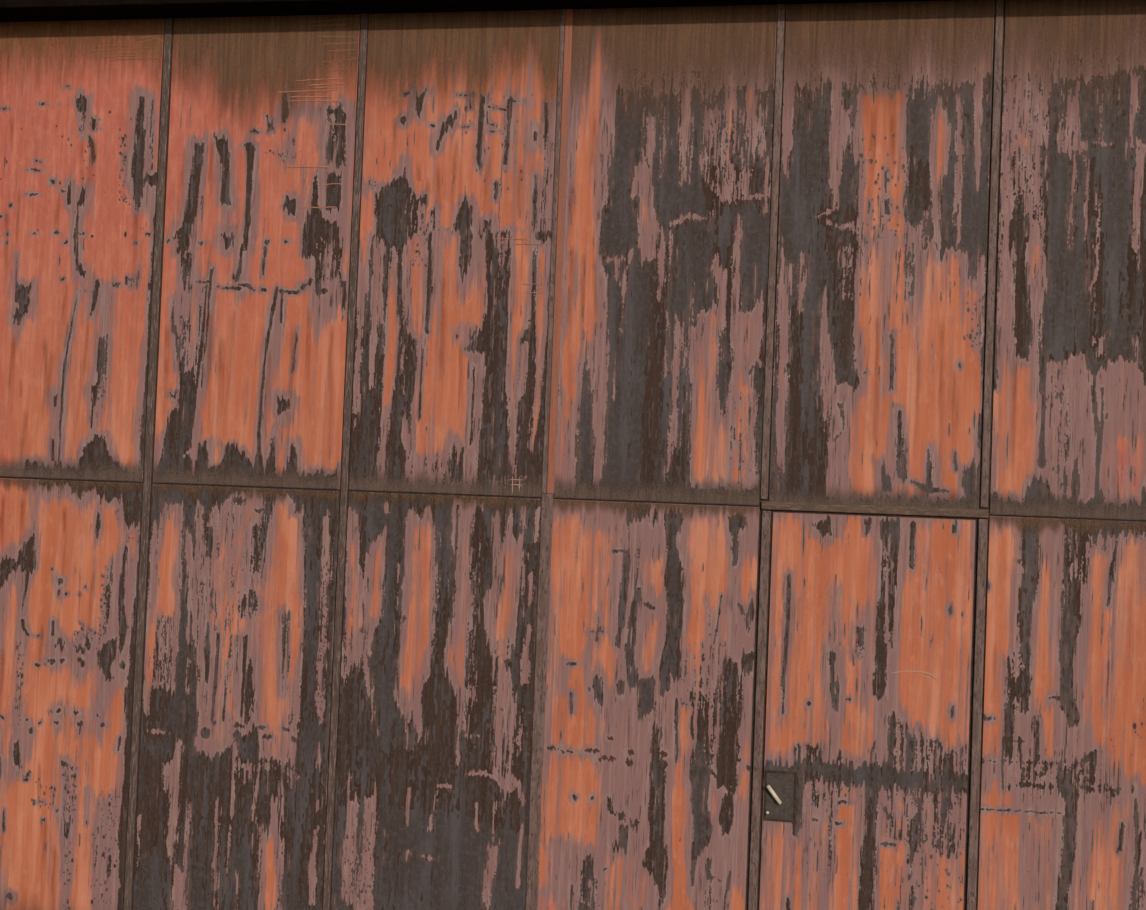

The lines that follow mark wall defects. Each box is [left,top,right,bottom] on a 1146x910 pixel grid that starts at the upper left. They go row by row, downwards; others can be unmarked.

peeling [0,88,562,910]
peeling [556,53,1146,910]